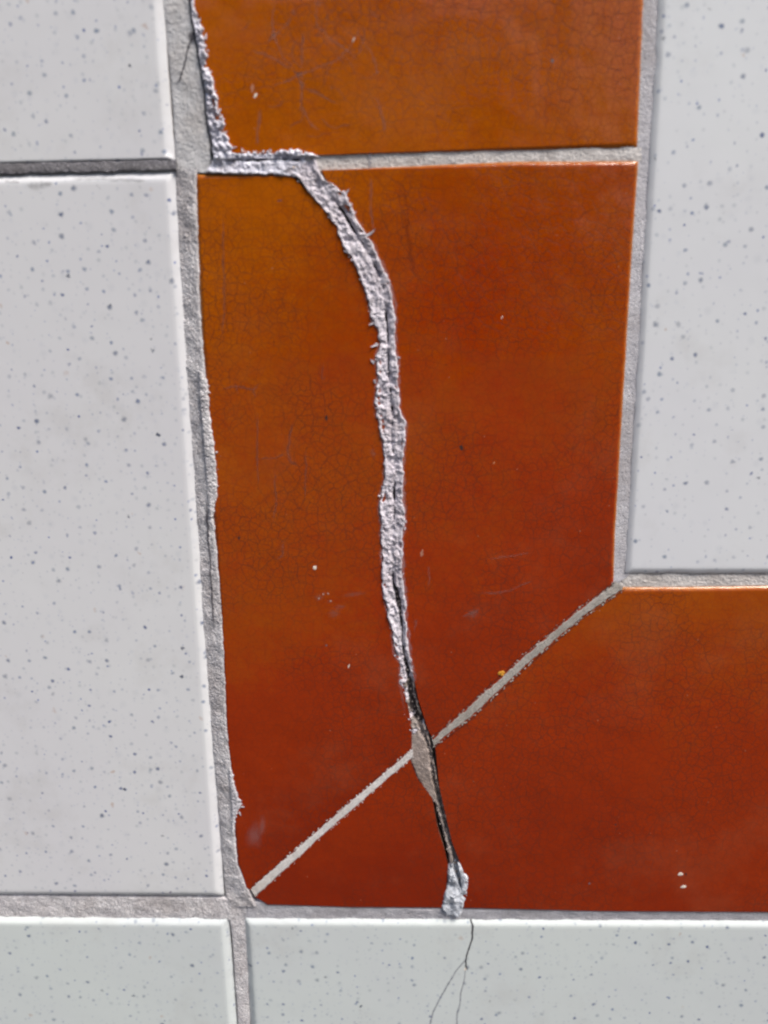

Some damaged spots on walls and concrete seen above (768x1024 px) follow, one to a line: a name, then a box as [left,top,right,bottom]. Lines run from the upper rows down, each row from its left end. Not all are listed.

crack [178,0,460,879]
crack [430,919,474,1023]